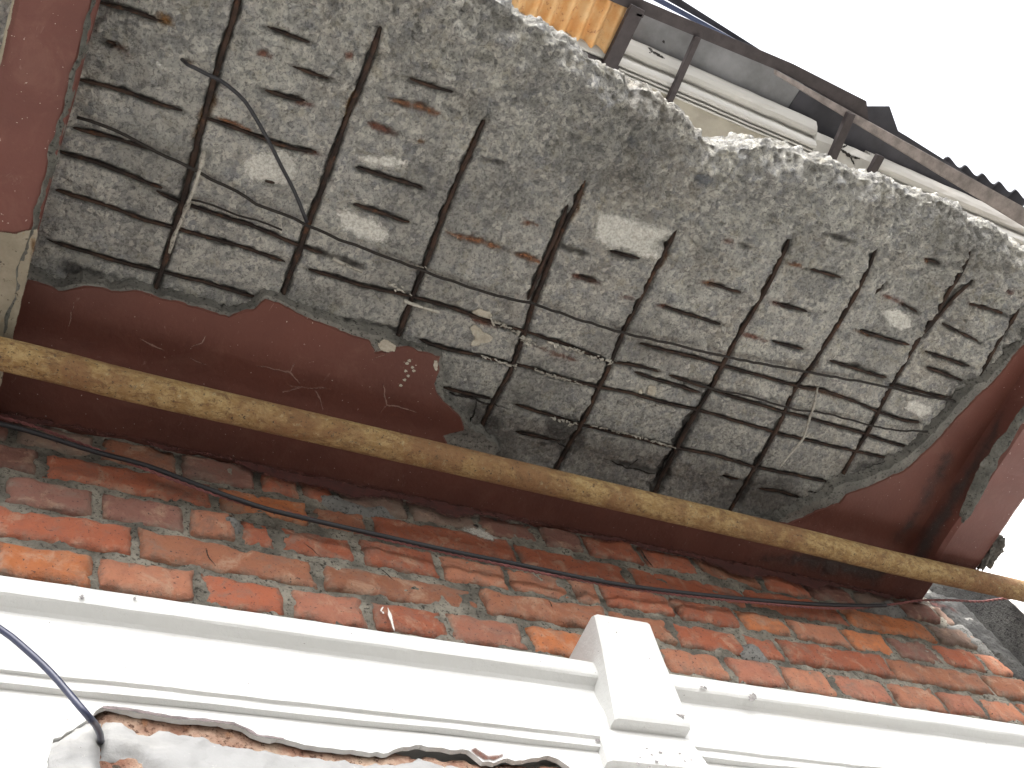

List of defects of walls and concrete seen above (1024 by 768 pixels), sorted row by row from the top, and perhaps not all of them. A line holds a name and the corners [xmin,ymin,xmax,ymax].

spalling [0,0,1024,523]
spalling [87,706,561,768]